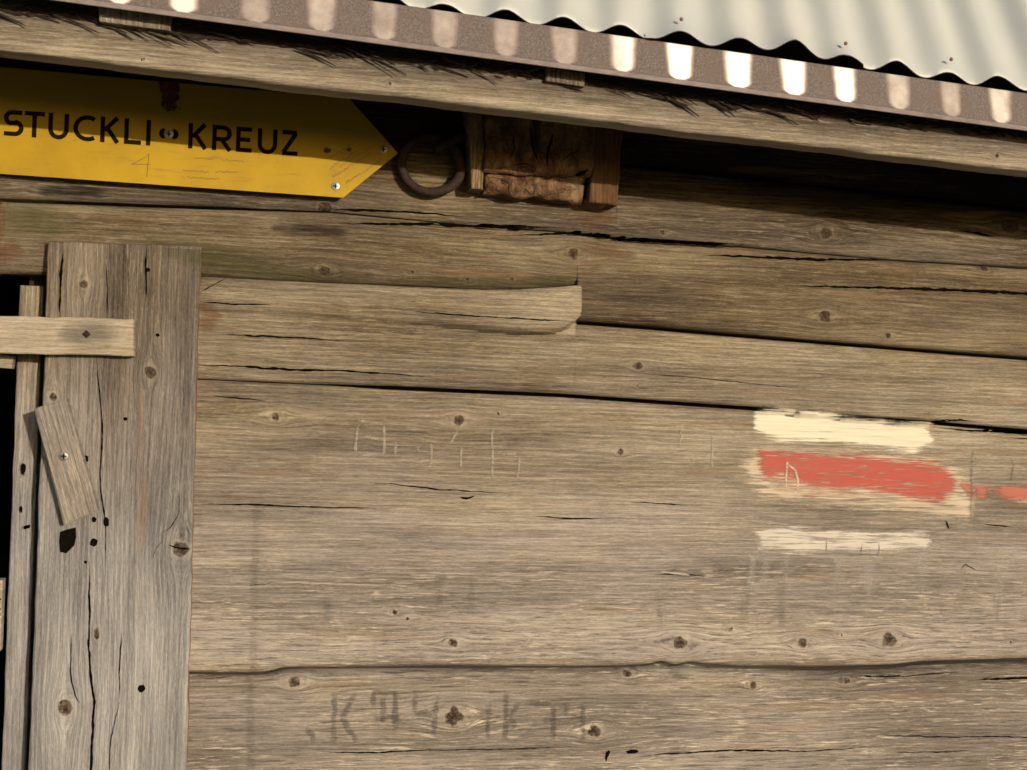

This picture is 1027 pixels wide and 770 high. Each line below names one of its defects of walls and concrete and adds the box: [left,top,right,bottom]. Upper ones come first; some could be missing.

crack [338,209,1027,295]